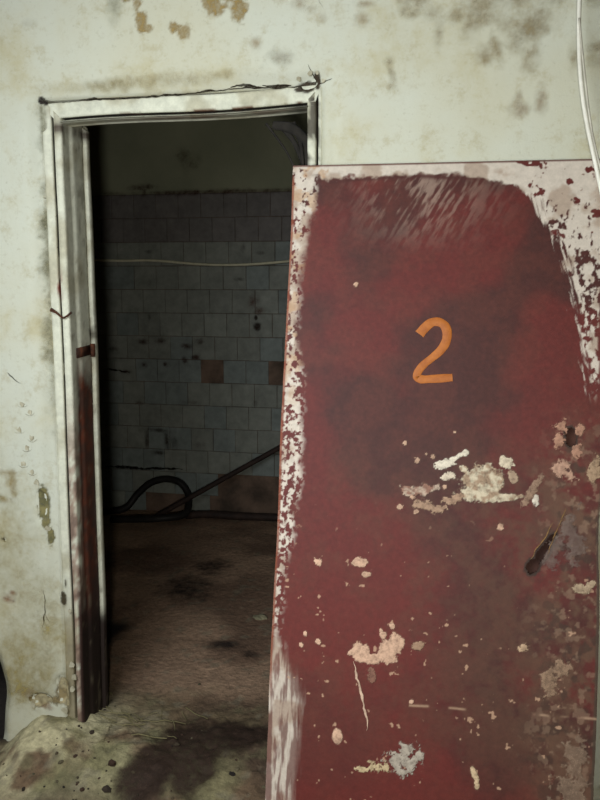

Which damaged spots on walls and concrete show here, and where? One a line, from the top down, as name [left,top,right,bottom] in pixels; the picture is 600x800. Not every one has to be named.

crack [62,65,331,103]
flaking render [21,461,55,544]